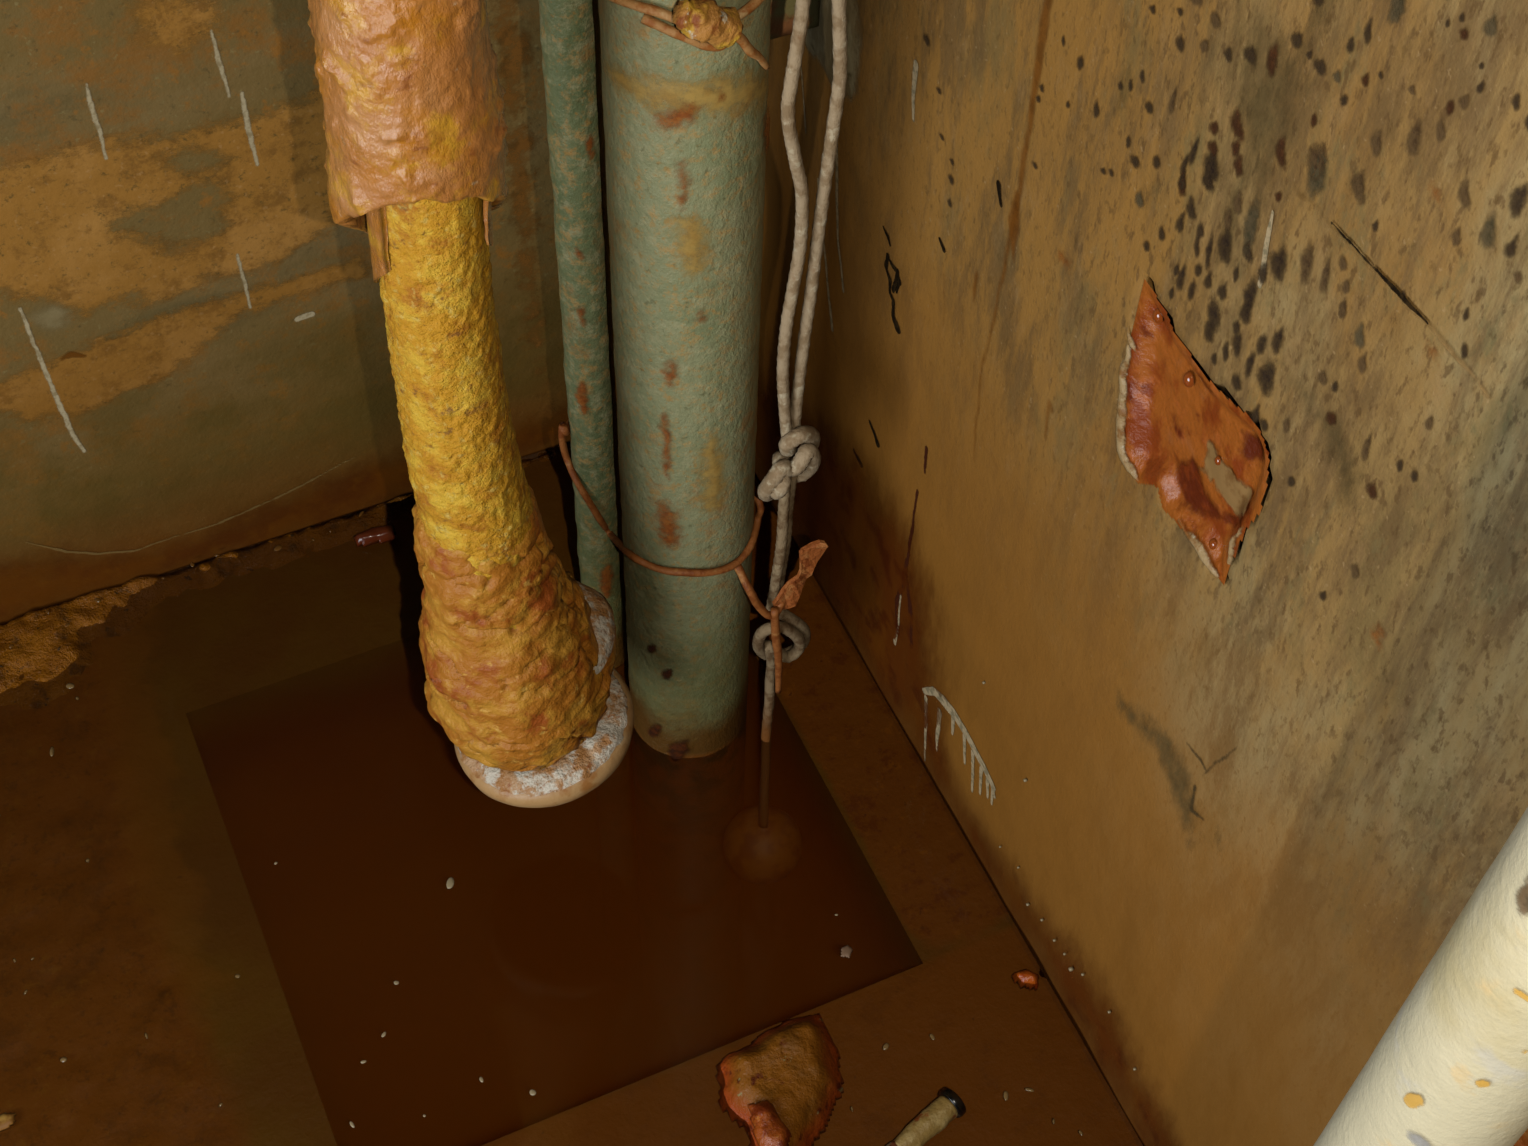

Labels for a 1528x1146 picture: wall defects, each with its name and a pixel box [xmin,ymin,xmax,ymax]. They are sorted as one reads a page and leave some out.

spalling [1347,0,1404,52]
spalling [1446,13,1496,40]
spalling [1145,89,1176,113]
spalling [1407,63,1484,155]
spalling [1512,94,1528,130]
spalling [1458,182,1470,207]
spalling [1510,185,1527,217]
spalling [1480,217,1522,284]
crack [1325,222,1487,395]
spalling [1116,110,1349,585]
spalling [1354,324,1366,373]
spalling [1366,484,1376,499]